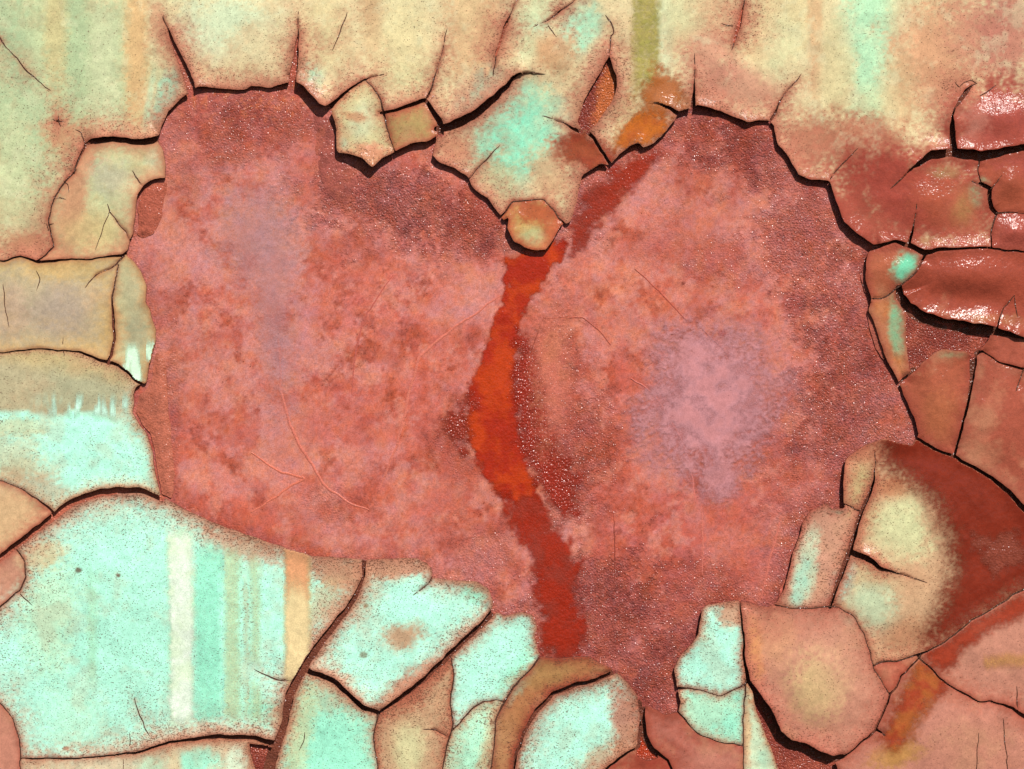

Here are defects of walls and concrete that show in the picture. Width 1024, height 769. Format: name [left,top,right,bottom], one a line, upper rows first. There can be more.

crack [162,16,195,90]
crack [329,0,575,150]
crack [0,115,159,384]
peeling [0,0,654,769]
rust [443,66,686,657]
peeling [515,0,1024,769]
crack [873,80,1024,512]
crack [0,480,164,607]
rust [284,550,311,679]
crack [0,560,613,769]
crack [606,700,672,769]
crack [678,455,1024,769]